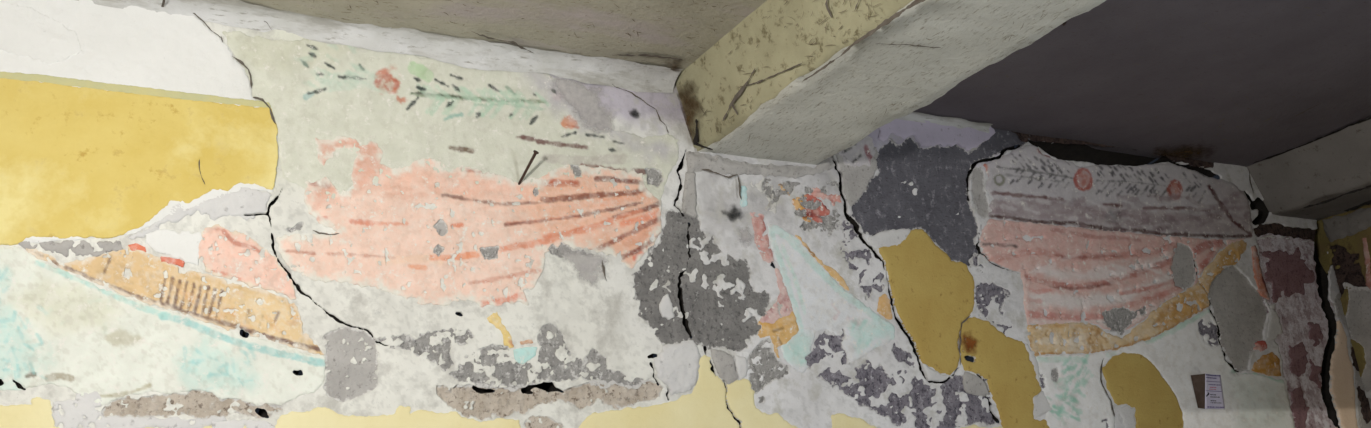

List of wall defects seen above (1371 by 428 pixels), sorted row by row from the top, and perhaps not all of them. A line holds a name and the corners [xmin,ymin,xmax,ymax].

flaking render [18,187,271,265]
flaking render [51,390,283,428]
crack [244,191,388,346]
flaking render [323,209,789,428]
crack [612,54,741,428]
flaking render [805,329,996,428]
crack [833,161,999,422]
flaking render [762,128,1135,334]
flaking render [1025,344,1058,419]
flaking render [1101,405,1136,428]
flaking render [1171,223,1371,428]
crack [1301,185,1371,428]